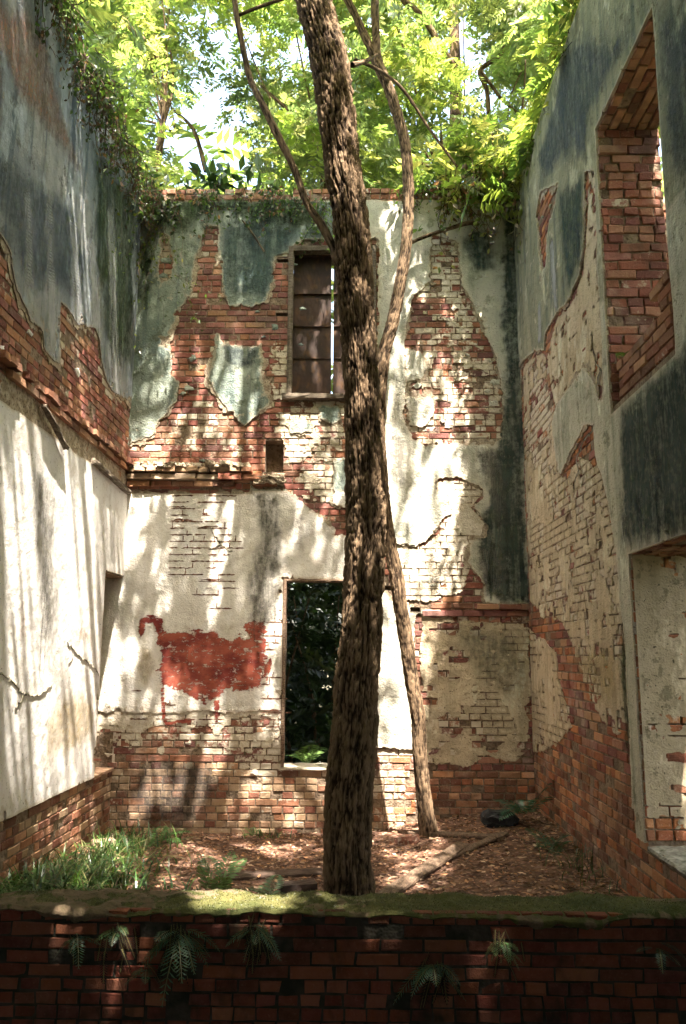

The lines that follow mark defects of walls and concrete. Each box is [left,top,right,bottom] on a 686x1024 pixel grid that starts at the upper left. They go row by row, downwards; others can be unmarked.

damp [0,162,120,396]
damp [227,216,301,294]
flaking render [372,238,381,335]
damp [225,346,257,366]
flaking render [0,225,346,609]
damp [464,216,529,603]
peeling [397,139,646,807]
damp [620,345,686,543]
crack [0,672,52,709]
crack [67,642,100,676]
peeling [97,672,291,775]